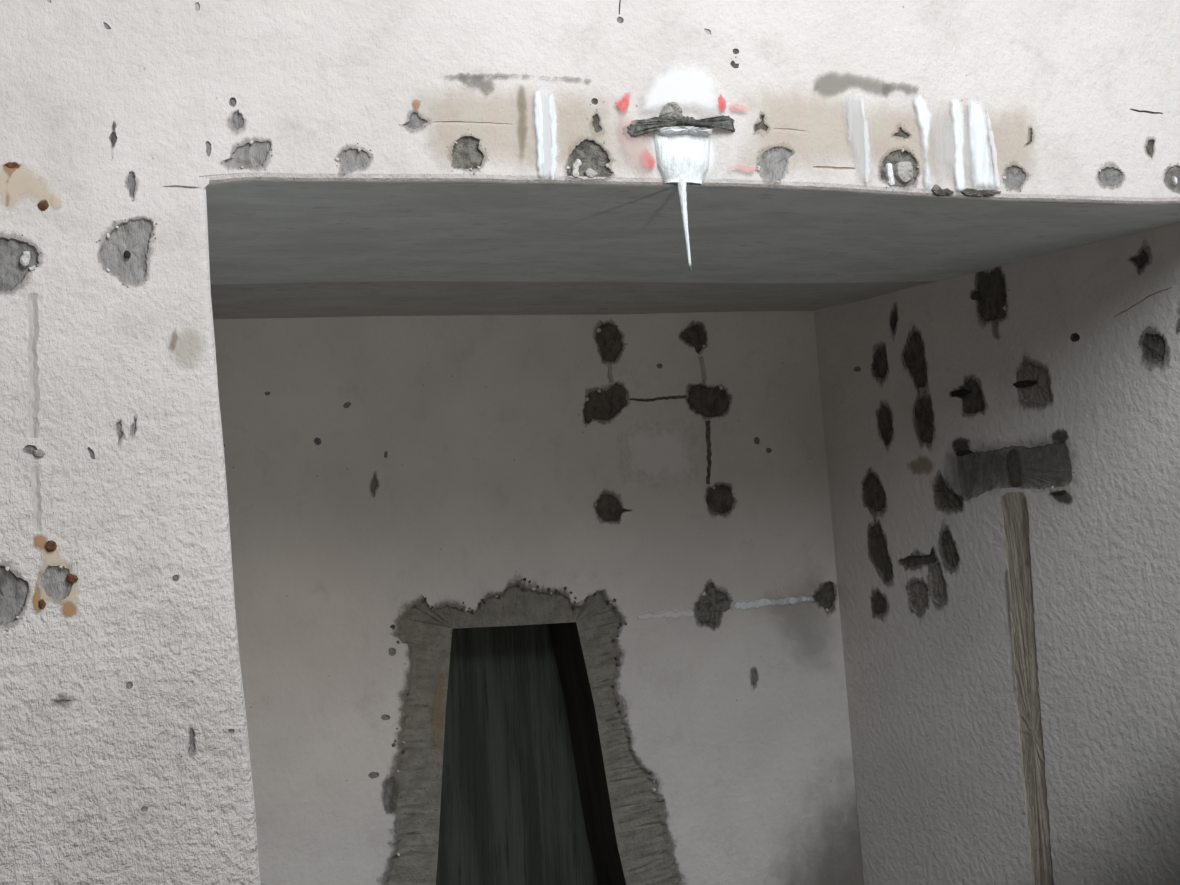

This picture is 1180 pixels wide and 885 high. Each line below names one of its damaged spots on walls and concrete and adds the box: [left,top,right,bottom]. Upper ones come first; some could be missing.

rust [0,162,61,211]
spalling [1164,164,1180,192]
spalling [0,233,42,291]
spalling [96,218,157,288]
rust [33,535,76,617]
flaking render [368,578,681,885]